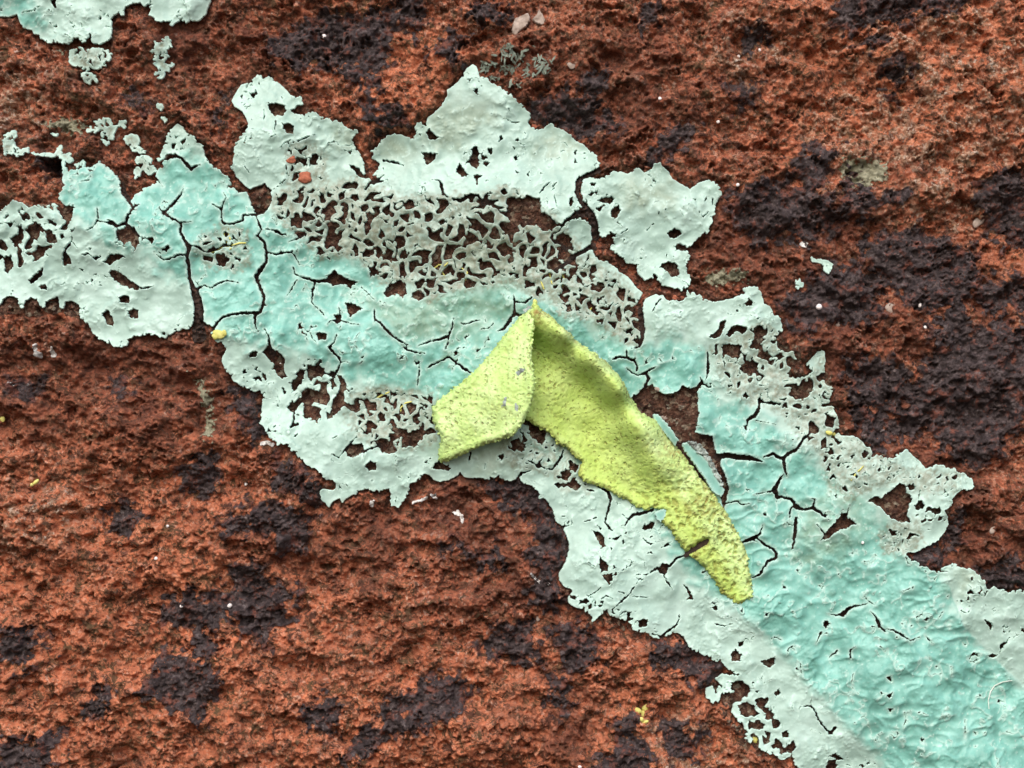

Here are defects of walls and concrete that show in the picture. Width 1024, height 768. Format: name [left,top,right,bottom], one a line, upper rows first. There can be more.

peeling [0,0,211,45]
peeling [4,255,14,273]
peeling [11,226,24,248]
peeling [45,229,57,244]
peeling [117,225,140,250]
crack [49,155,532,384]
crack [541,169,659,273]
peeling [581,162,722,292]
crack [612,299,661,388]
crack [744,397,781,430]
crack [560,486,654,540]
crack [713,431,848,578]